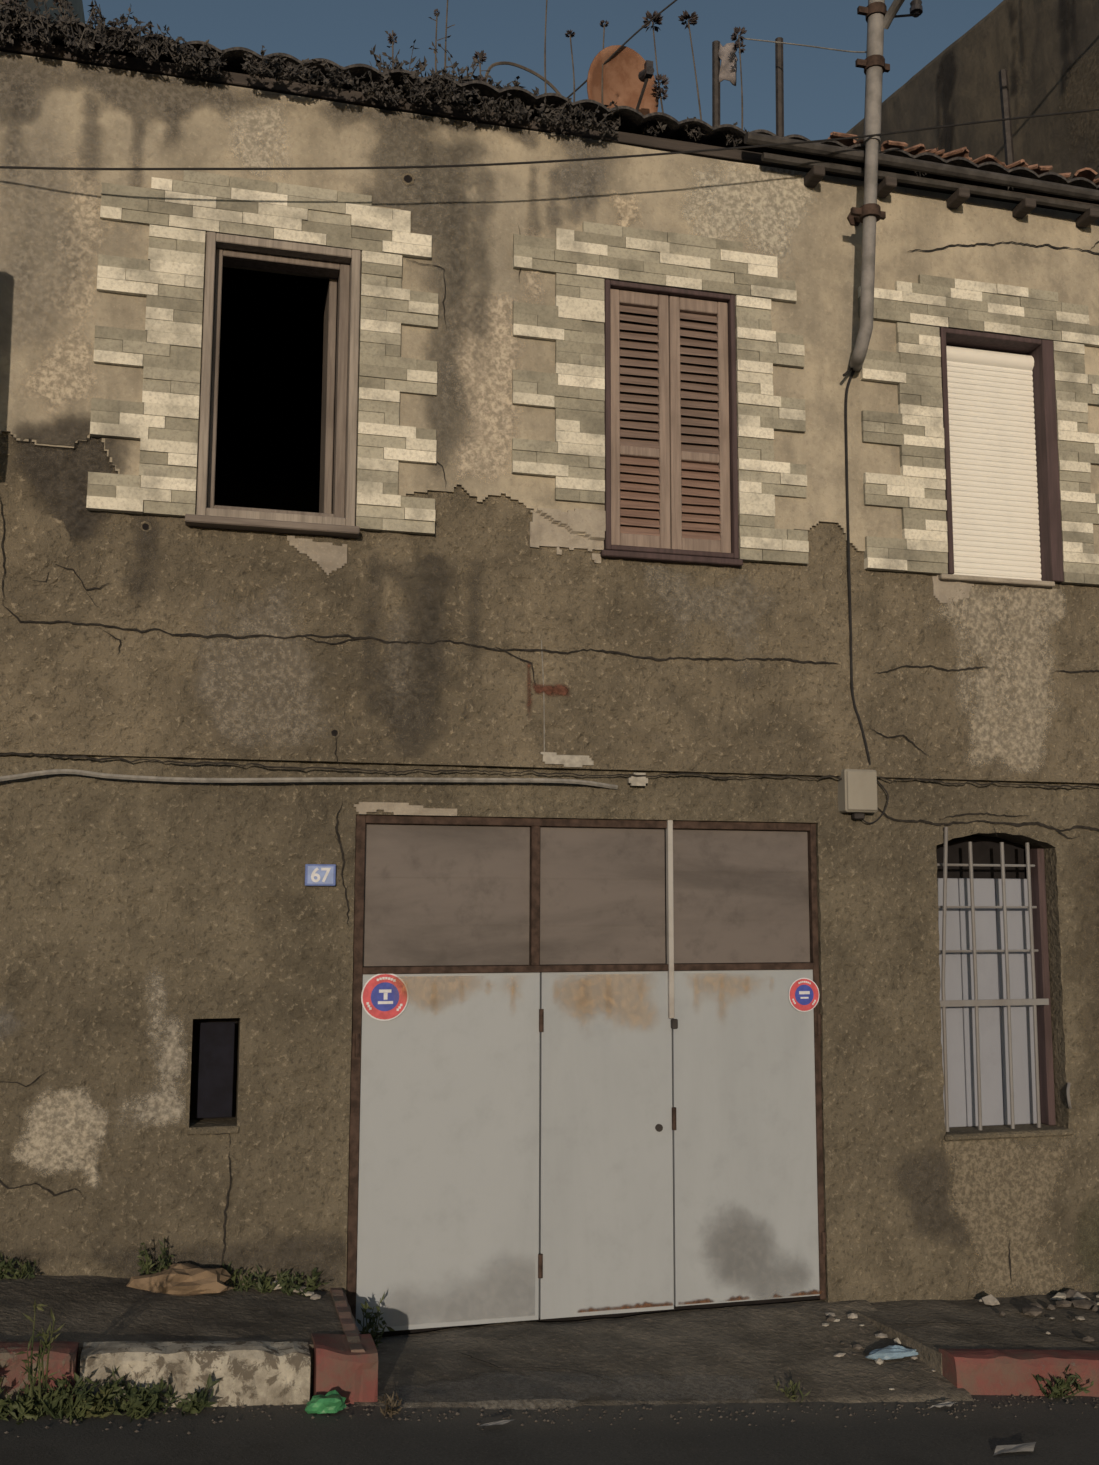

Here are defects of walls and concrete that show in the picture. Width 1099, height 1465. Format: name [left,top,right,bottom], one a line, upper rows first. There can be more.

water stain [938,52,956,152]
water stain [1059,0,1099,156]
water stain [558,134,638,227]
water stain [685,165,810,256]
crack [908,241,1099,254]
peeling [287,535,347,576]
crack [0,500,838,683]
peeling [529,508,606,564]
rust [528,664,569,706]
crack [875,665,983,673]
peeling [13,1088,107,1186]
crack [0,1181,84,1198]